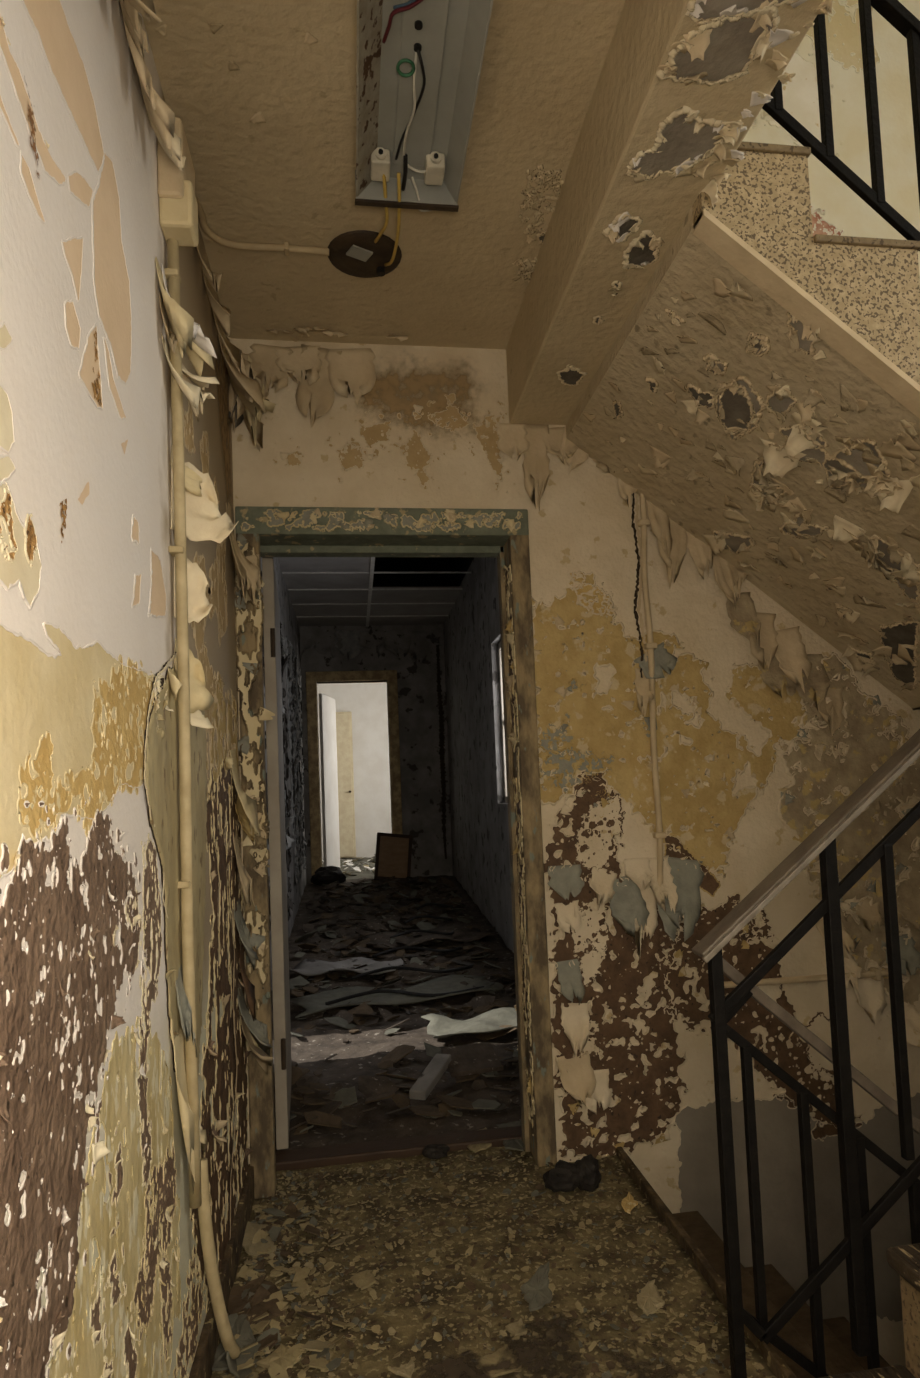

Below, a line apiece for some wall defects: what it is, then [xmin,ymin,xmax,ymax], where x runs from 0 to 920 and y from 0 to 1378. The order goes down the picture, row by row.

peeling [624,0,881,208]
peeling [602,211,665,297]
peeling [811,205,844,237]
crack [631,493,648,681]
peeling [0,246,672,1378]
peeling [531,289,920,1241]